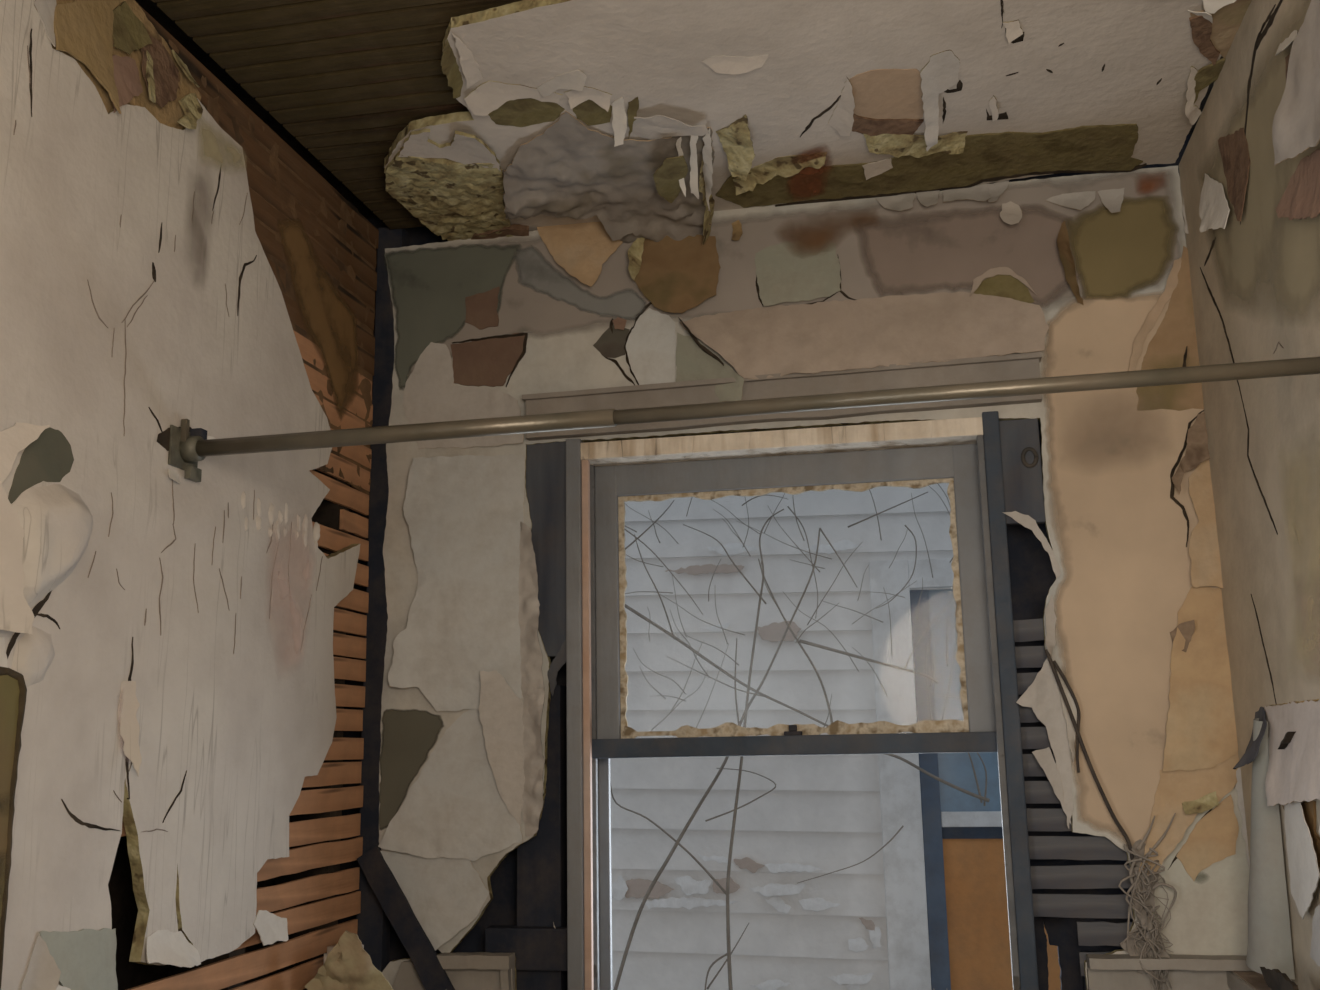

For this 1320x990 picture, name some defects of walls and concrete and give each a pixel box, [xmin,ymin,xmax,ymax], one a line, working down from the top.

crack [998,0,1006,28]
flaking render [1185,0,1252,125]
crack [87,165,248,436]
crack [225,255,257,316]
flaking render [34,0,1147,430]
flaking render [1045,127,1251,305]
peeling [0,484,35,668]
flaking render [999,418,1061,578]
flaking render [126,433,568,990]
peeling [611,853,841,914]
flaking render [1013,595,1133,990]
peeling [1301,801,1320,868]